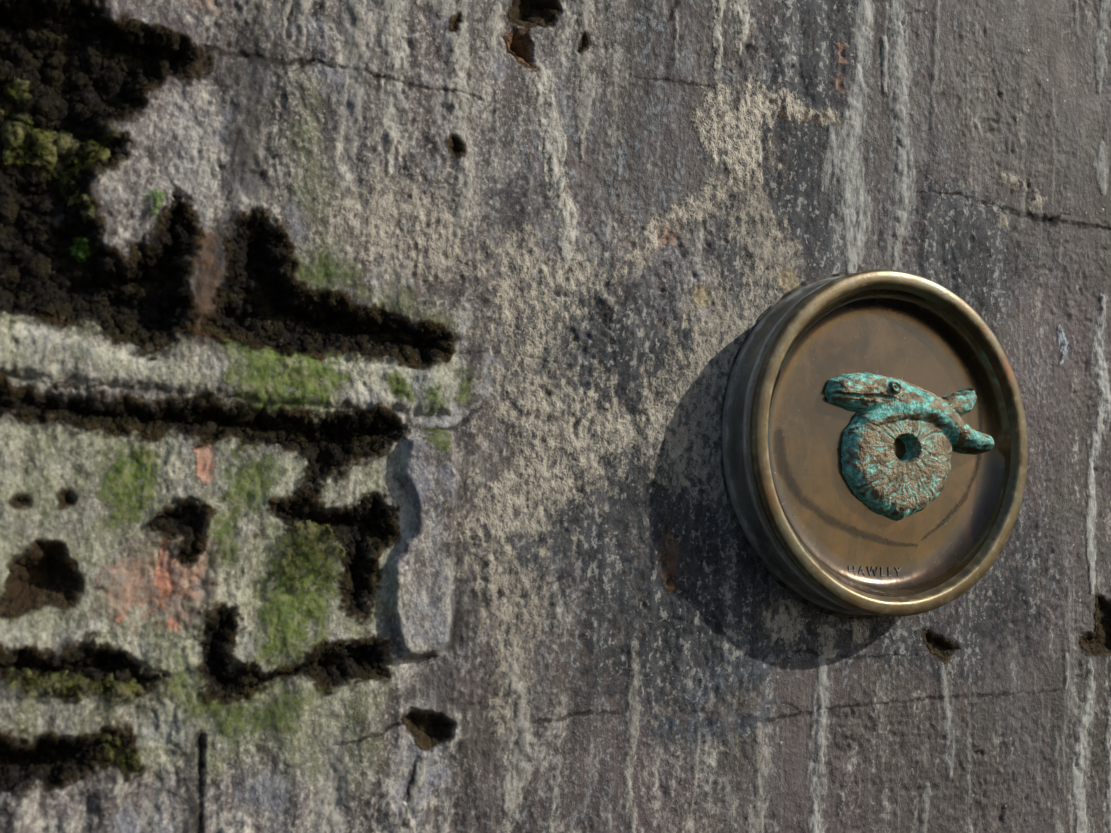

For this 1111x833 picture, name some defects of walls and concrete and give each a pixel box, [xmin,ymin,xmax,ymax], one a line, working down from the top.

crack [201,44,481,100]
crack [920,192,1111,230]
leakage [502,0,1066,833]
efflorescence [1086,294,1111,594]
hole [1080,594,1111,657]
crack [789,649,925,661]
hole [402,710,455,752]
crack [534,710,621,723]
crack [763,689,1061,723]
efflorescence [1072,659,1096,833]
crack [194,729,207,833]